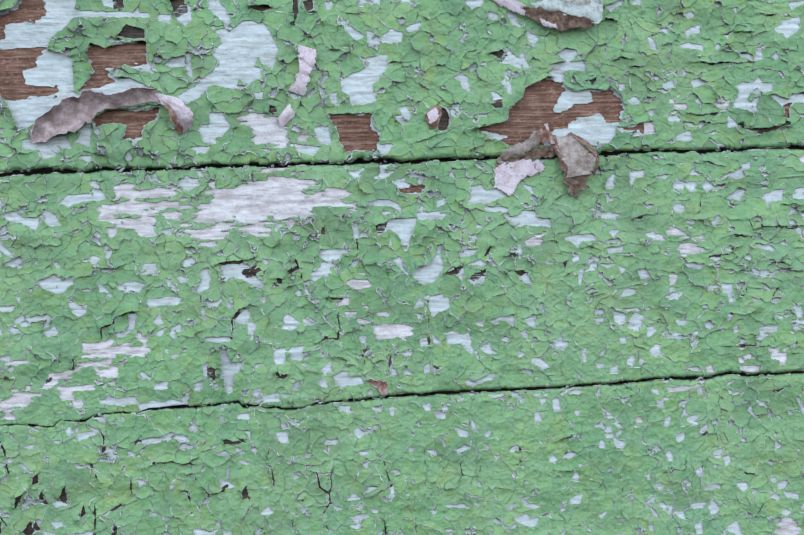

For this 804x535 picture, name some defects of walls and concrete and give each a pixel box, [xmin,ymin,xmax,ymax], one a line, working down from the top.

peeling [0,0,194,163]
peeling [164,0,278,103]
peeling [190,19,421,157]
peeling [465,11,692,156]
crack [701,59,754,67]
crack [688,112,787,134]
peeling [0,168,451,421]
crack [219,257,255,265]
crack [230,307,247,339]
peeling [332,273,498,375]
crack [709,222,802,258]
crack [152,458,229,502]